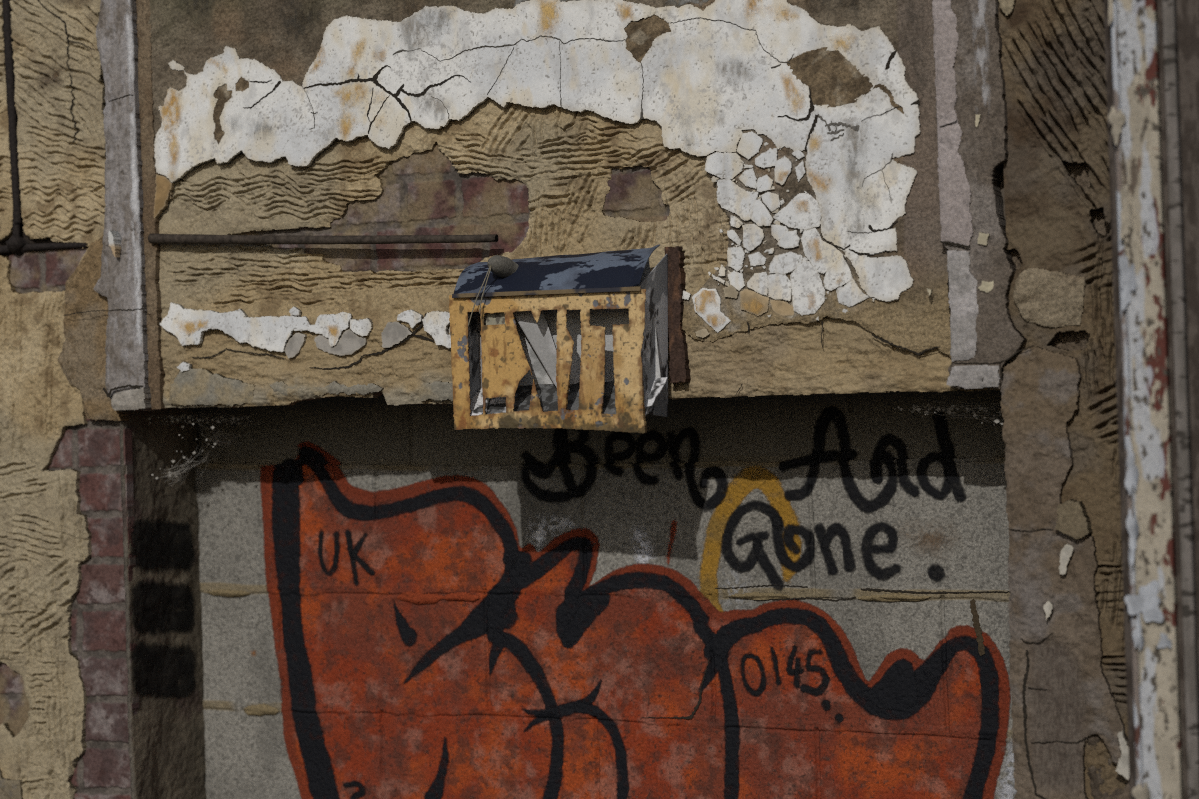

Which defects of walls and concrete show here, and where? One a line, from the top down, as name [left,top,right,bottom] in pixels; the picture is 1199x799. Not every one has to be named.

crack [243,35,644,134]
crack [671,17,794,68]
crack [885,50,896,70]
peeling [154,0,933,301]
spalling [0,227,89,294]
crack [682,88,898,348]
crack [940,240,970,248]
peeling [1119,255,1136,310]
peeling [160,302,451,358]
crack [872,335,1034,385]
peeling [1125,438,1139,566]
peeling [1124,580,1172,651]